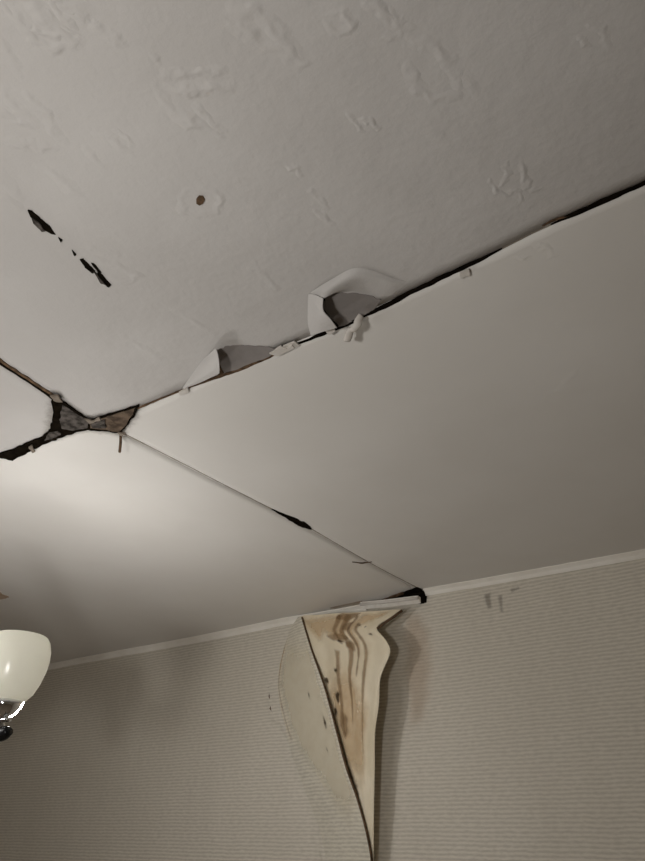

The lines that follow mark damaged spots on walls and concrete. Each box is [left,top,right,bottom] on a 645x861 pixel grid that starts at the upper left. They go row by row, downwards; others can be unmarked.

peeling [308,268,409,342]
crack [137,180,645,410]
crack [0,358,54,399]
peeling [183,344,294,389]
spalling [0,394,139,461]
crack [125,434,416,587]